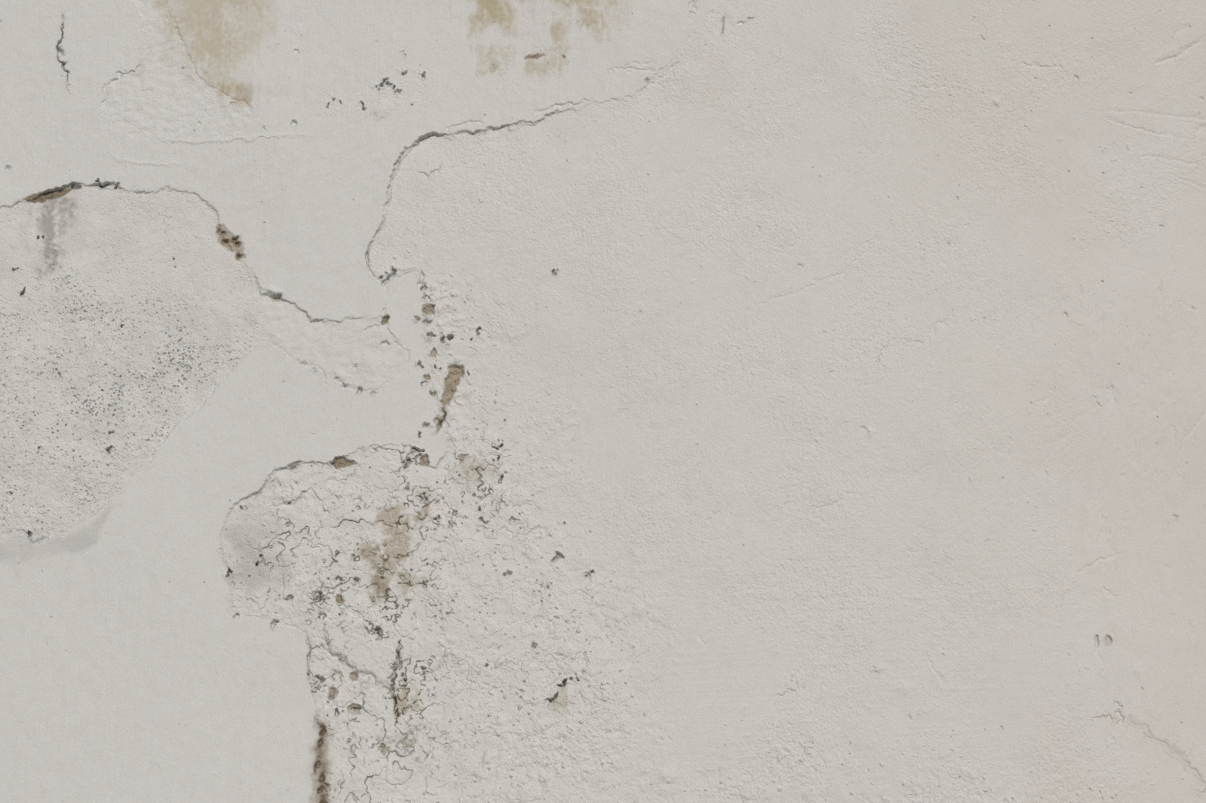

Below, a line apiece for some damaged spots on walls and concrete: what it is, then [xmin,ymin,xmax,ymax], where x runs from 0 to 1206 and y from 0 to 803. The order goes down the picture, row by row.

leakage [149,0,280,114]
leakage [465,0,633,82]
crack [687,0,727,40]
crack [357,47,693,286]
spalling [0,179,681,803]